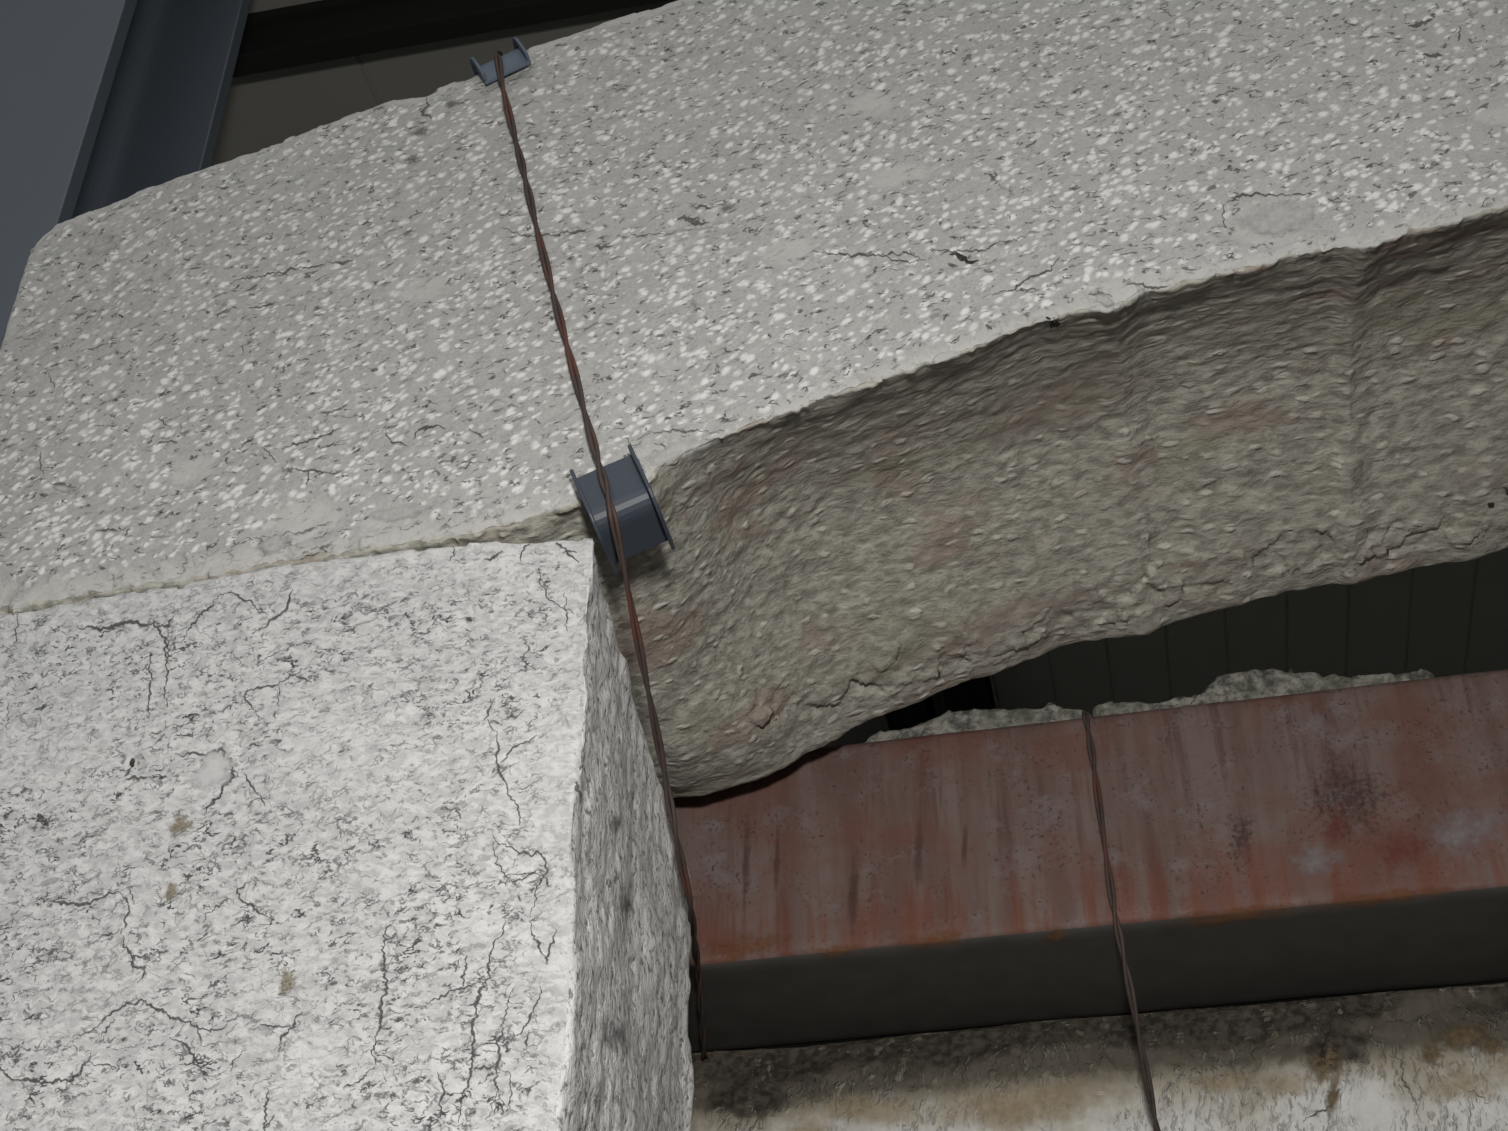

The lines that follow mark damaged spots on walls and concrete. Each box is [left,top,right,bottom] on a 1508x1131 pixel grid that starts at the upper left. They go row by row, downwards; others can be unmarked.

crack [449,542,579,628]
crack [79,589,293,718]
crack [244,666,311,721]
crack [175,747,265,815]
crack [204,881,268,925]
crack [427,699,557,1123]
crack [0,888,302,1084]
crack [263,1087,275,1131]
crack [343,922,394,1088]
leakage [692,990,1399,1120]